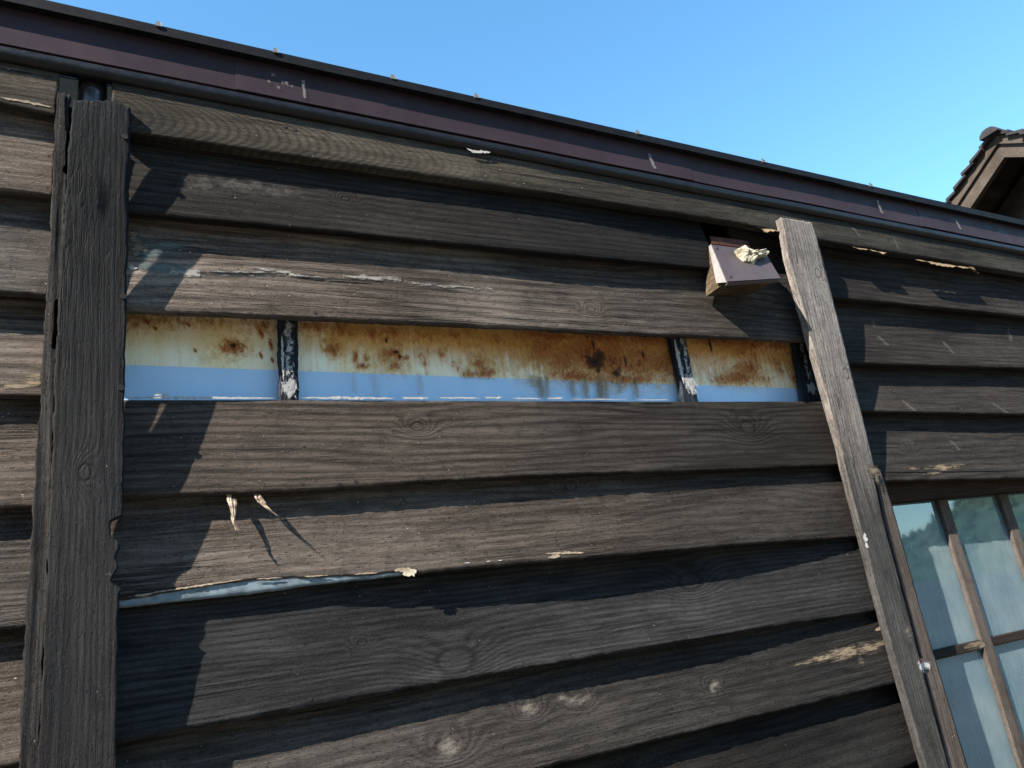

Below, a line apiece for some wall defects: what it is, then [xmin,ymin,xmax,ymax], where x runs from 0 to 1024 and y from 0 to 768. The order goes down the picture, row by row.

rust [220,319,276,362]
rust [300,321,675,399]
rust [693,339,796,386]